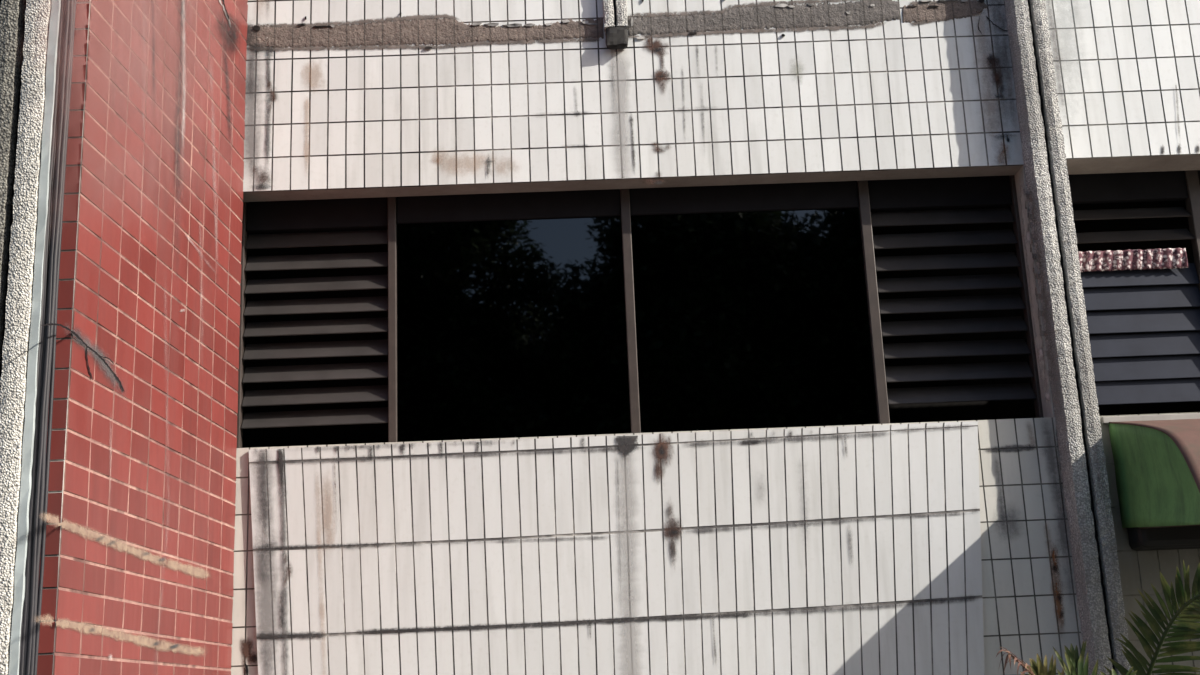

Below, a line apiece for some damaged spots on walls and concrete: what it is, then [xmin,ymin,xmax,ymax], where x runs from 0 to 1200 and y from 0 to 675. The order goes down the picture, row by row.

spalling [246,13,604,51]
spalling [627,0,989,39]
rust [646,38,669,91]
rust [988,55,1002,97]
crack [41,323,125,392]
rust [655,437,671,478]
water stain [742,432,883,452]
spalling [44,514,208,578]
water stain [257,442,501,675]
rust [665,506,681,556]
rust [1051,549,1064,625]
spalling [40,616,204,655]